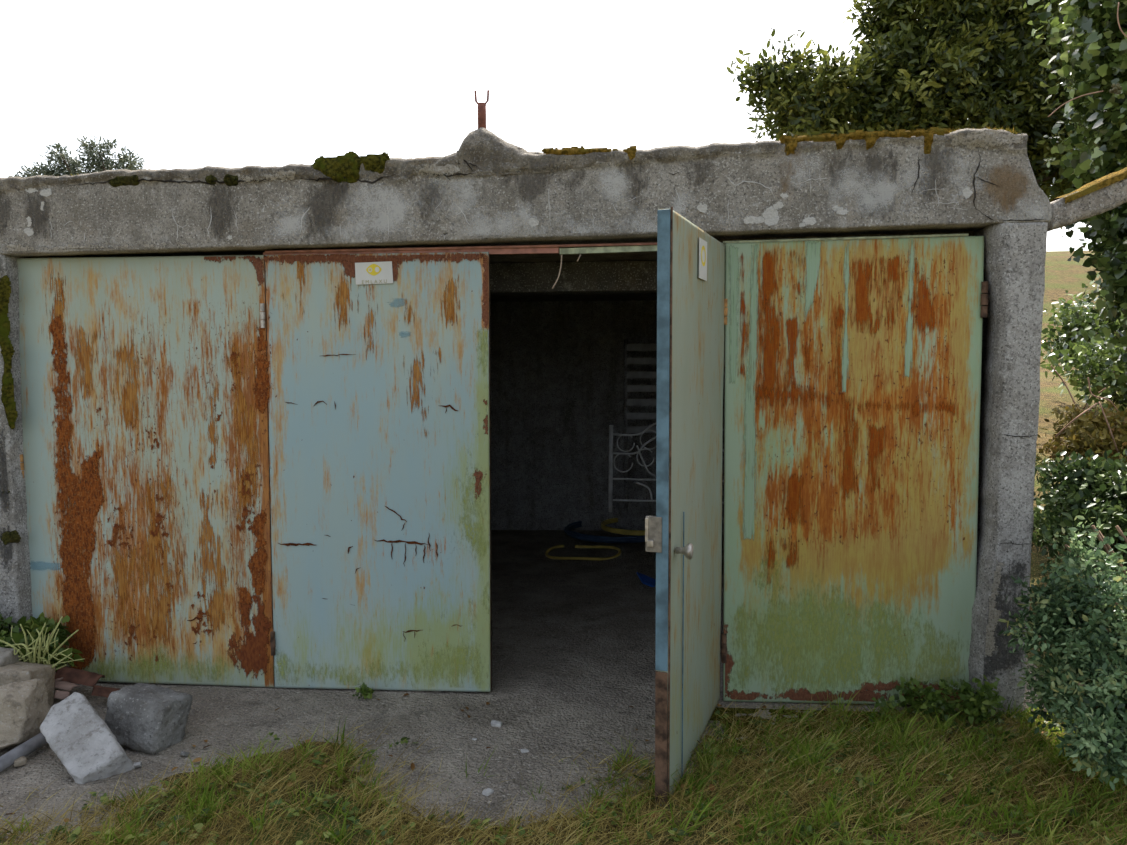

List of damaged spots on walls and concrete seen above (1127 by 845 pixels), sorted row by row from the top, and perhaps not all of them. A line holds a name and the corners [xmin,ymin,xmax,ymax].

damp [27,195,49,235]
damp [209,187,232,237]
damp [278,177,477,237]
damp [468,166,550,235]
peeling [743,193,789,226]
peeling [799,215,817,227]
rust [204,253,488,360]
rust [403,348,441,436]
rust [740,249,955,499]
damp [0,418,12,569]
rust [45,271,272,680]
rust [725,651,966,703]